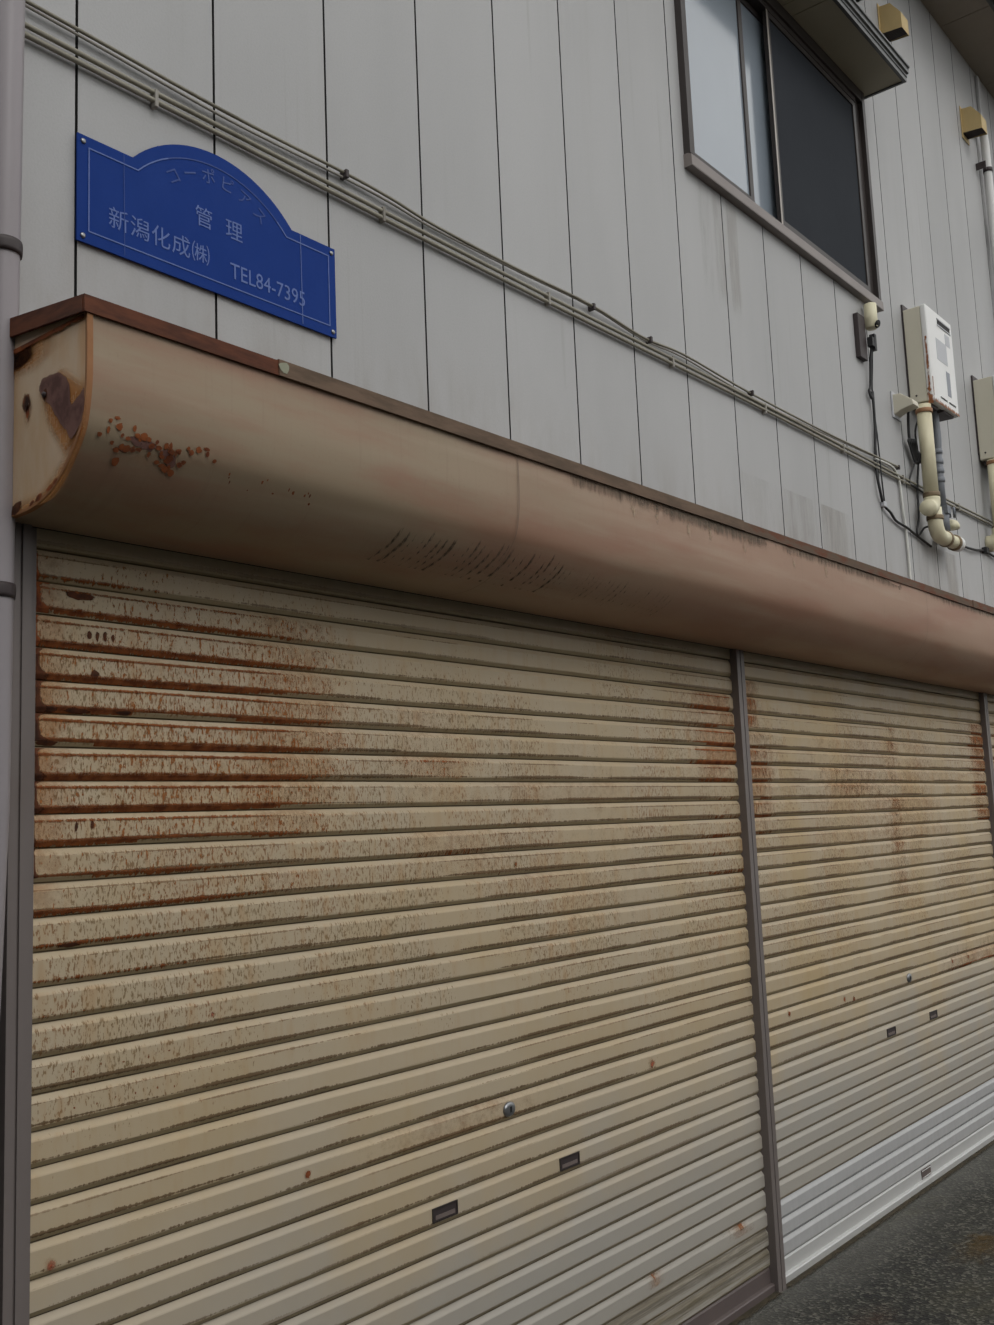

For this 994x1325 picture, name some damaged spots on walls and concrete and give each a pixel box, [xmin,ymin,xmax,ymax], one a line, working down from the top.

corrosion [14,314,84,375]
corrosion [11,372,217,515]
corrosion [33,553,358,918]
corrosion [683,682,773,875]
corrosion [967,725,994,819]
corrosion [33,928,191,949]
corrosion [33,959,198,984]